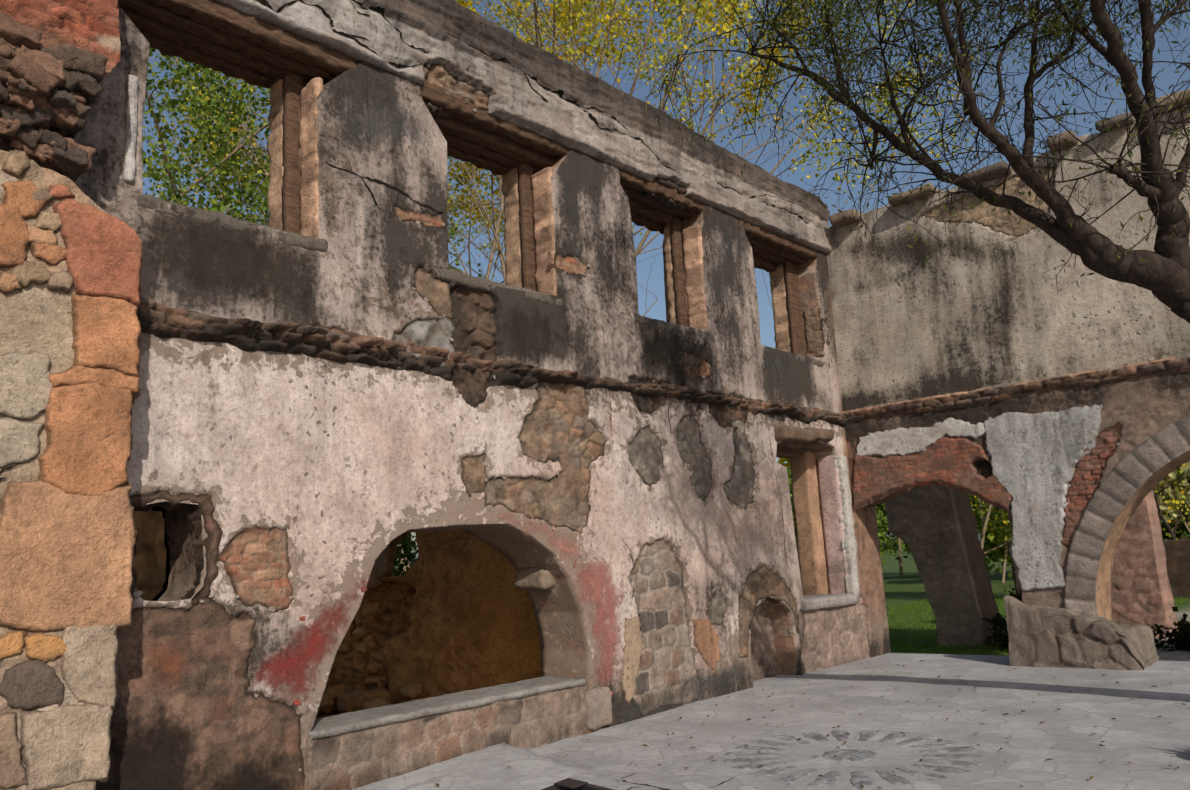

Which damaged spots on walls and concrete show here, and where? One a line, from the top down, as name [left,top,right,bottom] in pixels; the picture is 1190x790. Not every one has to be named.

leakage [344,96,420,183]
crack [323,97,444,213]
crack [257,0,679,173]
crack [717,183,808,224]
leakage [851,233,984,262]
leakage [997,248,1016,359]
spalling [680,360,712,378]
spalling [461,381,606,534]
flaking render [573,376,1122,715]
spalling [110,490,416,790]
spalling [95,753,118,790]
leakage [207,756,294,790]